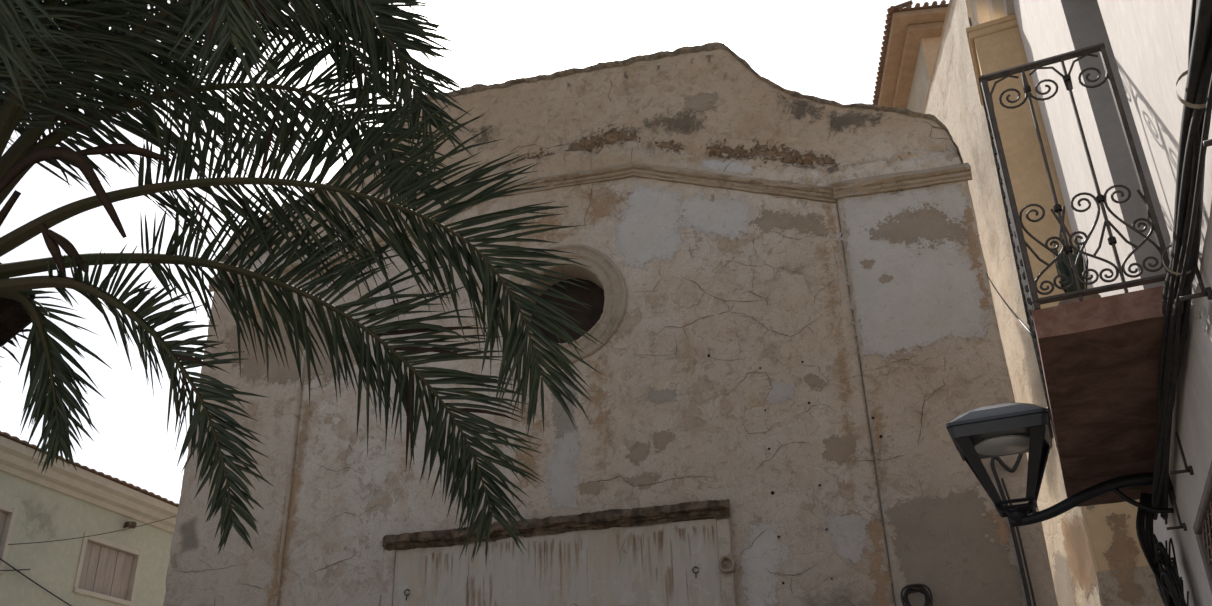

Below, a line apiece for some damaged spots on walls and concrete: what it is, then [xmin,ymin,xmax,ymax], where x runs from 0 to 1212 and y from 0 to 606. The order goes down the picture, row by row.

spalling [507,123,686,167]
spalling [701,138,841,176]
peeling [608,180,993,361]
crack [643,231,841,466]
peeling [549,365,578,440]
crack [863,381,946,468]
peeling [738,518,792,606]
peeling [865,487,1023,606]